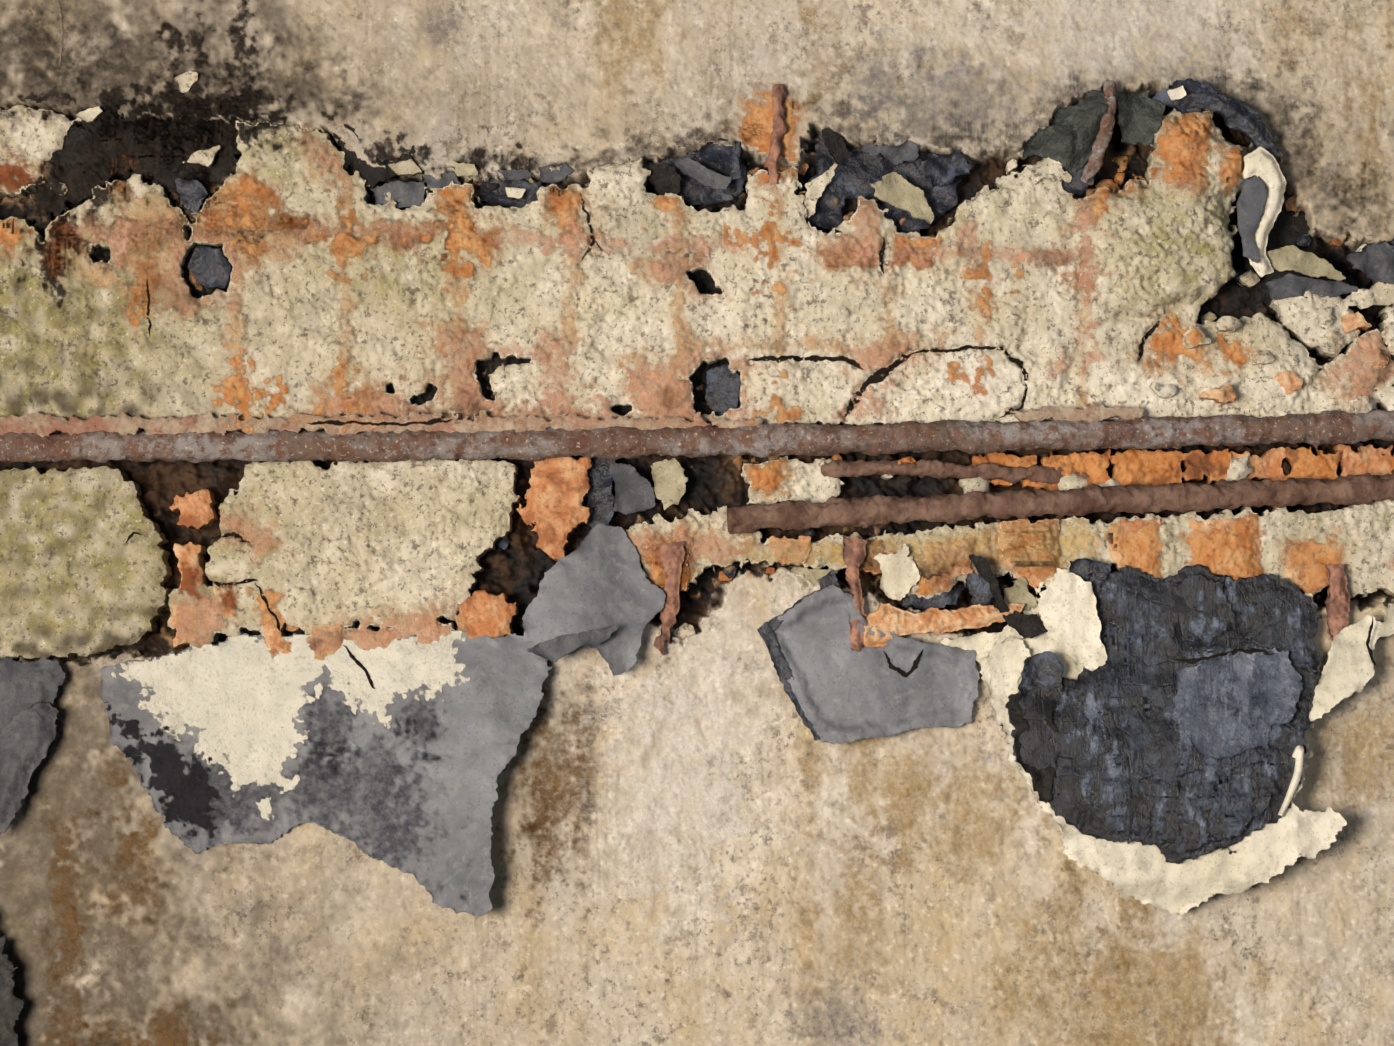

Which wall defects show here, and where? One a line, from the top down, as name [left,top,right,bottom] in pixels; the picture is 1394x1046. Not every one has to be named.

damp [10,0,294,135]
peeling [1167,86,1186,101]
damp [359,131,440,170]
damp [462,143,534,188]
corrosion [0,91,1261,434]
crack [748,345,1028,418]
spalling [0,105,1394,917]
corrosion [734,455,792,495]
corrosion [627,518,1163,597]
corrosion [1181,514,1265,581]
peeling [0,935,25,1046]